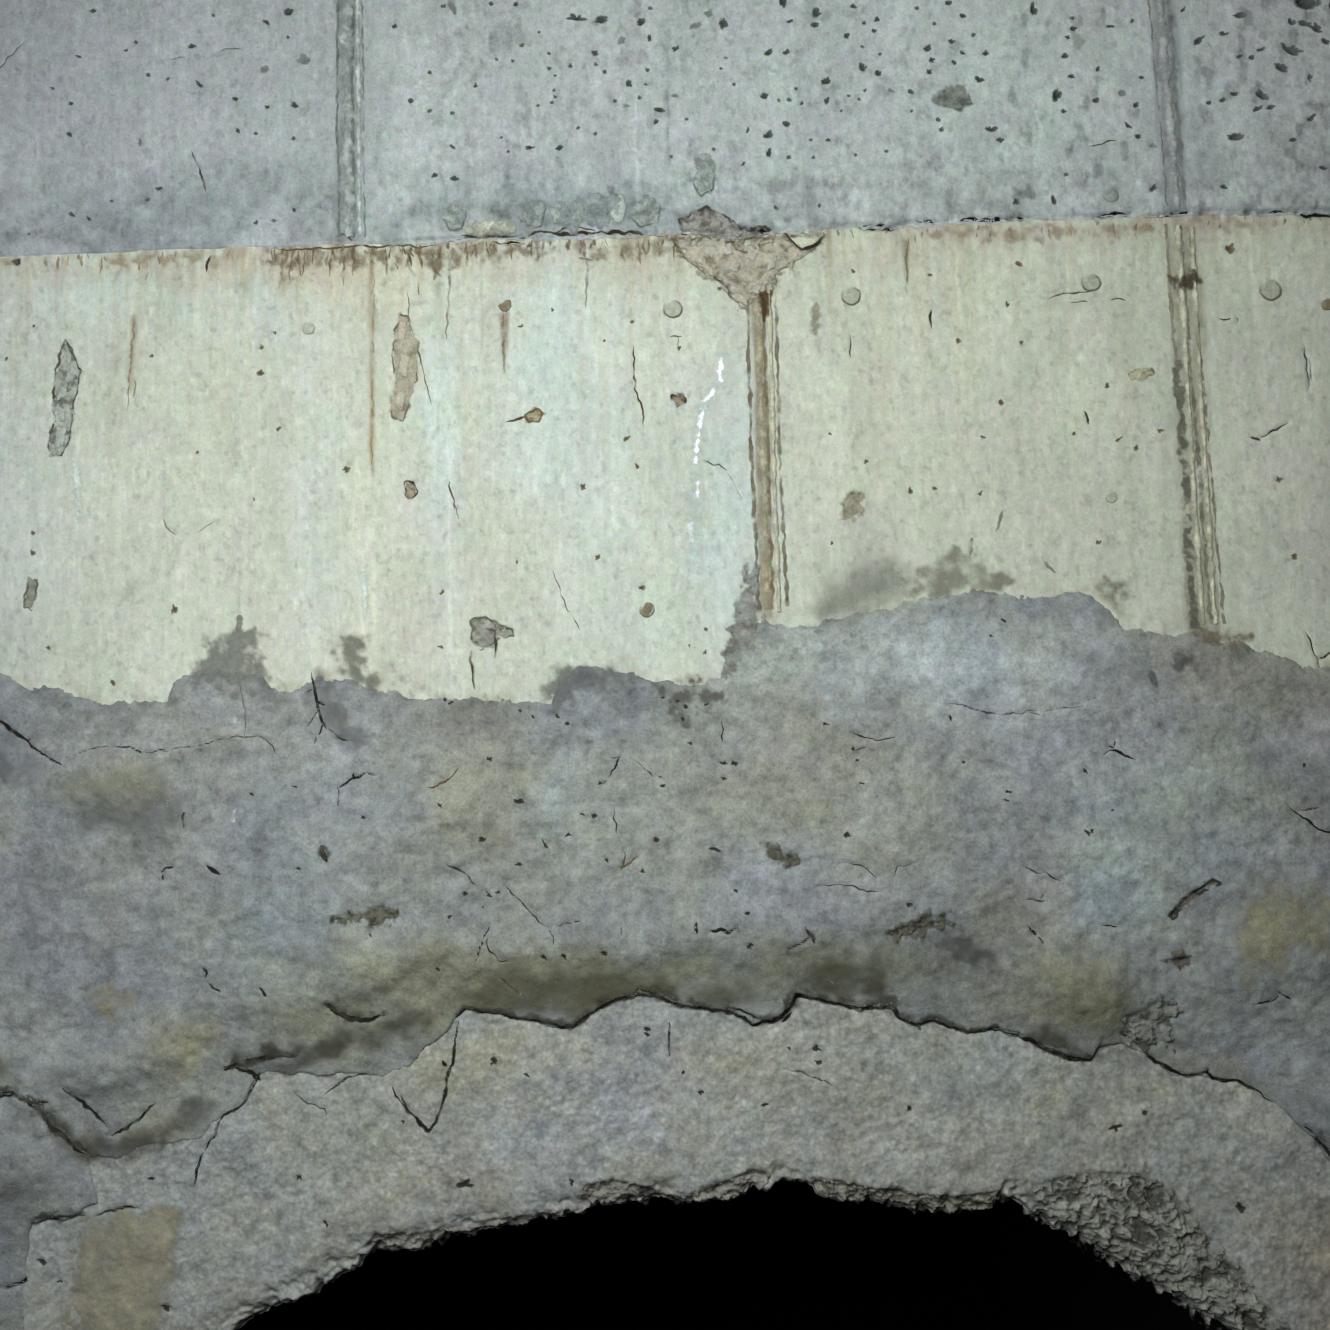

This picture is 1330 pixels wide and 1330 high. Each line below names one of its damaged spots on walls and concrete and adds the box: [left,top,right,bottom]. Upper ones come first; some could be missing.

rust [44,251,186,280]
rust [267,239,607,294]
spalling [47,340,82,456]
leakage [822,538,1012,615]
leakage [193,615,265,699]
spalling [469,616,514,689]
crack [295,862,1093,1133]
leakage [257,1012,425,1072]
crack [0,1086,155,1154]
crack [194,1044,295,1185]
spalling [370,1169,770,1249]
spalling [1026,1165,1289,1330]